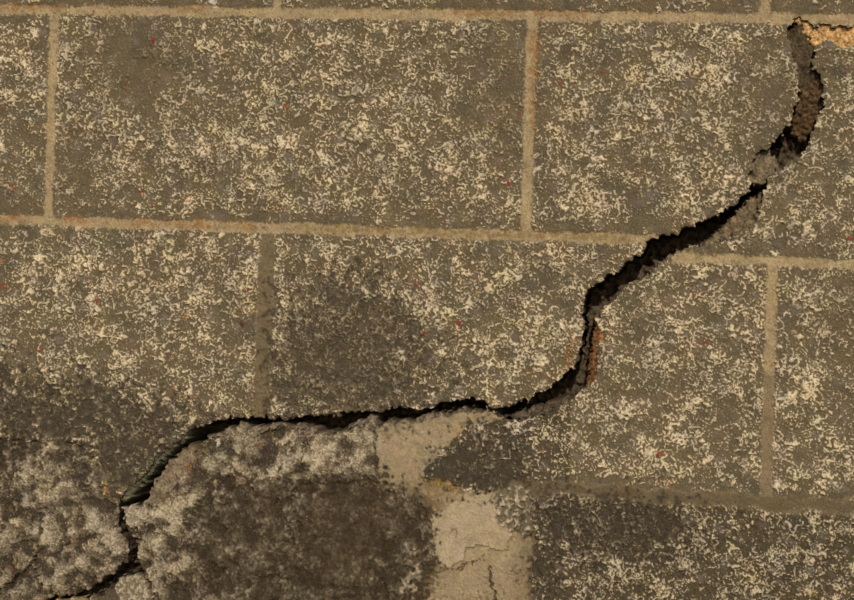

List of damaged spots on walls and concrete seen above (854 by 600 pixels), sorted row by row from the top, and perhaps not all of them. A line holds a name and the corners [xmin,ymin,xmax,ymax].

crack [746,16,854,189]
crack [78,185,766,600]
crack [0,511,45,595]
spalling [0,411,538,600]